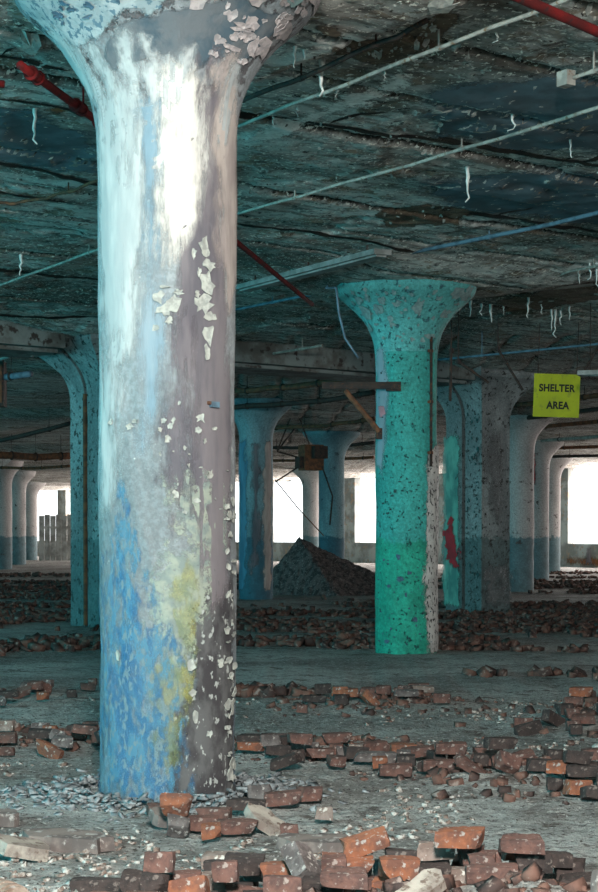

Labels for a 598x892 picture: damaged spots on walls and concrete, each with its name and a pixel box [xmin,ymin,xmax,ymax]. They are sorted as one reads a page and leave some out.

crack [239,112,598,167]
peeling [152,285,184,331]
peeling [192,236,217,360]
peeling [158,417,213,488]
peeling [195,413,218,444]